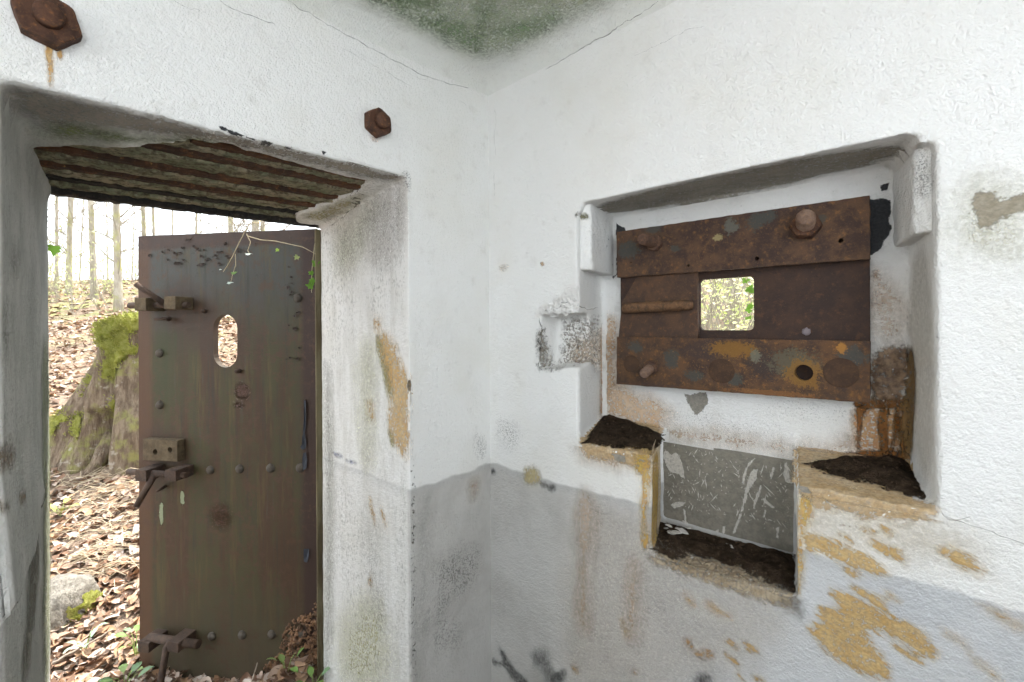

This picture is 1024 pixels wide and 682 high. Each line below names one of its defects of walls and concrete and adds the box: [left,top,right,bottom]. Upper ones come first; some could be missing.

rust [45,46,62,82]
peeling [972,191,1024,229]
spalling [535,283,595,365]
rust [574,324,937,609]